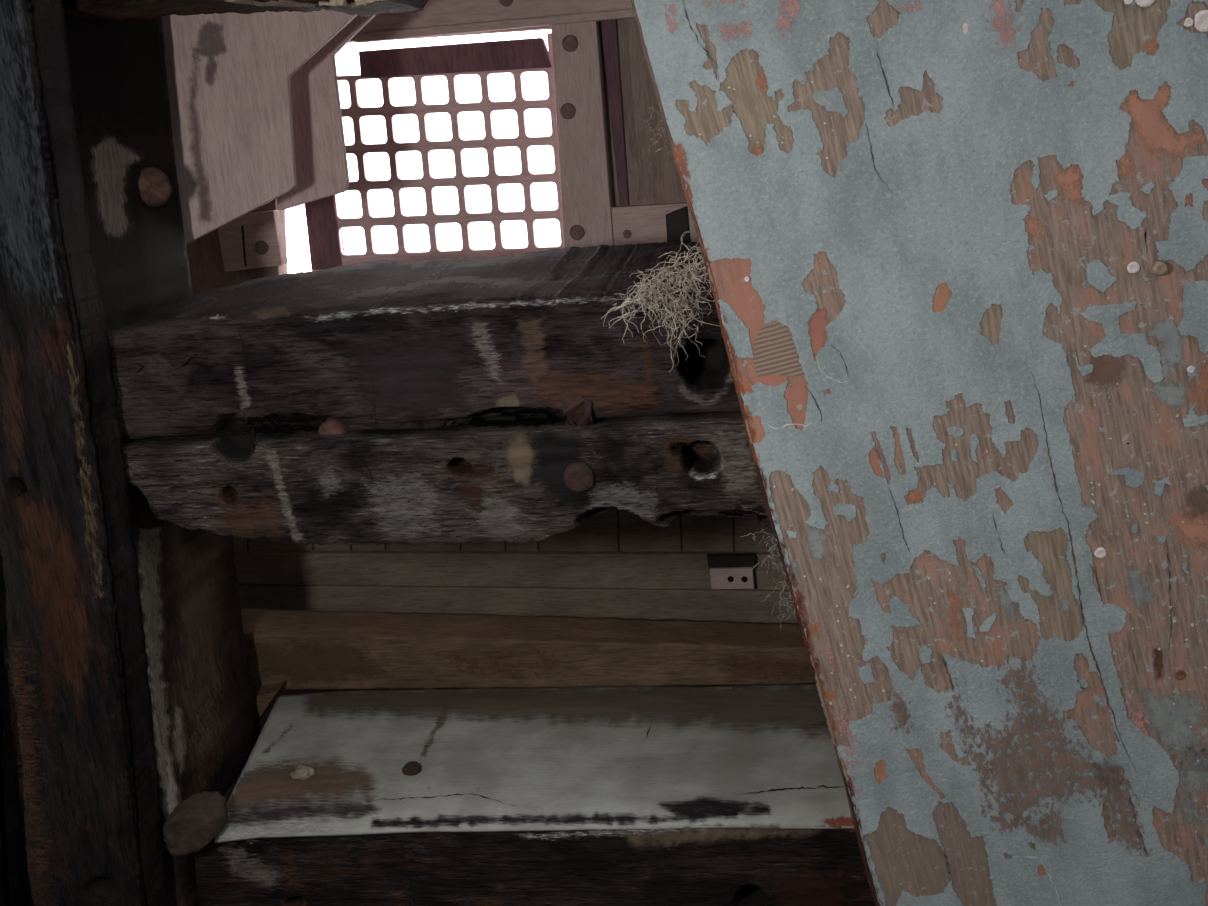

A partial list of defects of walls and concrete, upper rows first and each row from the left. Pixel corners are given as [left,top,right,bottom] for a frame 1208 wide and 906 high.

peeling [675,21,866,178]
crack [877,53,895,109]
peeling [884,70,943,127]
peeling [989,0,1208,87]
water stain [65,14,709,327]
peeling [706,251,846,430]
peeling [769,81,1208,906]
crack [1031,372,1147,854]
crack [1165,539,1173,647]
crack [369,793,515,806]
water stain [225,726,820,847]
crack [738,785,845,795]